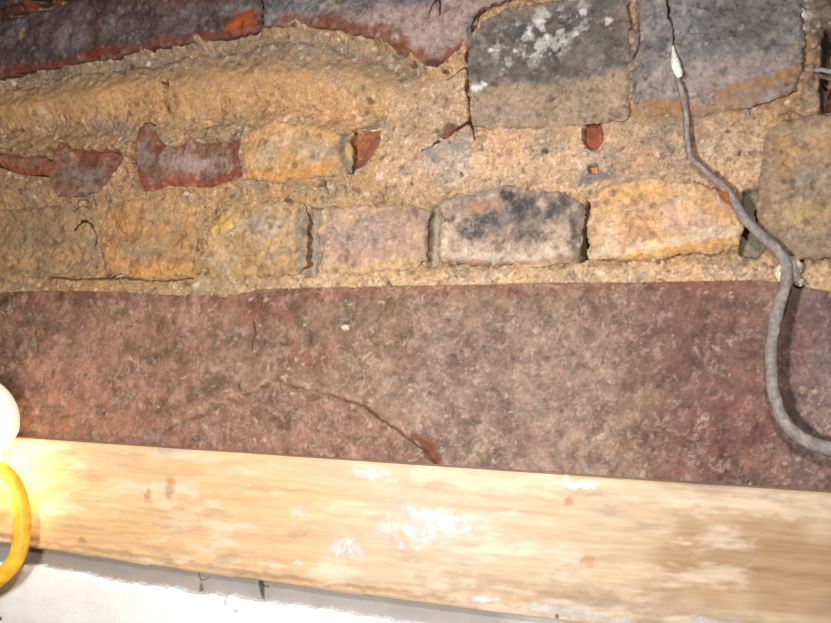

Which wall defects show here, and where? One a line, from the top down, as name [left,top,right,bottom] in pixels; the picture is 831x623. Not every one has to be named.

water stain [521,7,579,57]
crack [421,9,486,151]
corrosion [411,434,440,464]